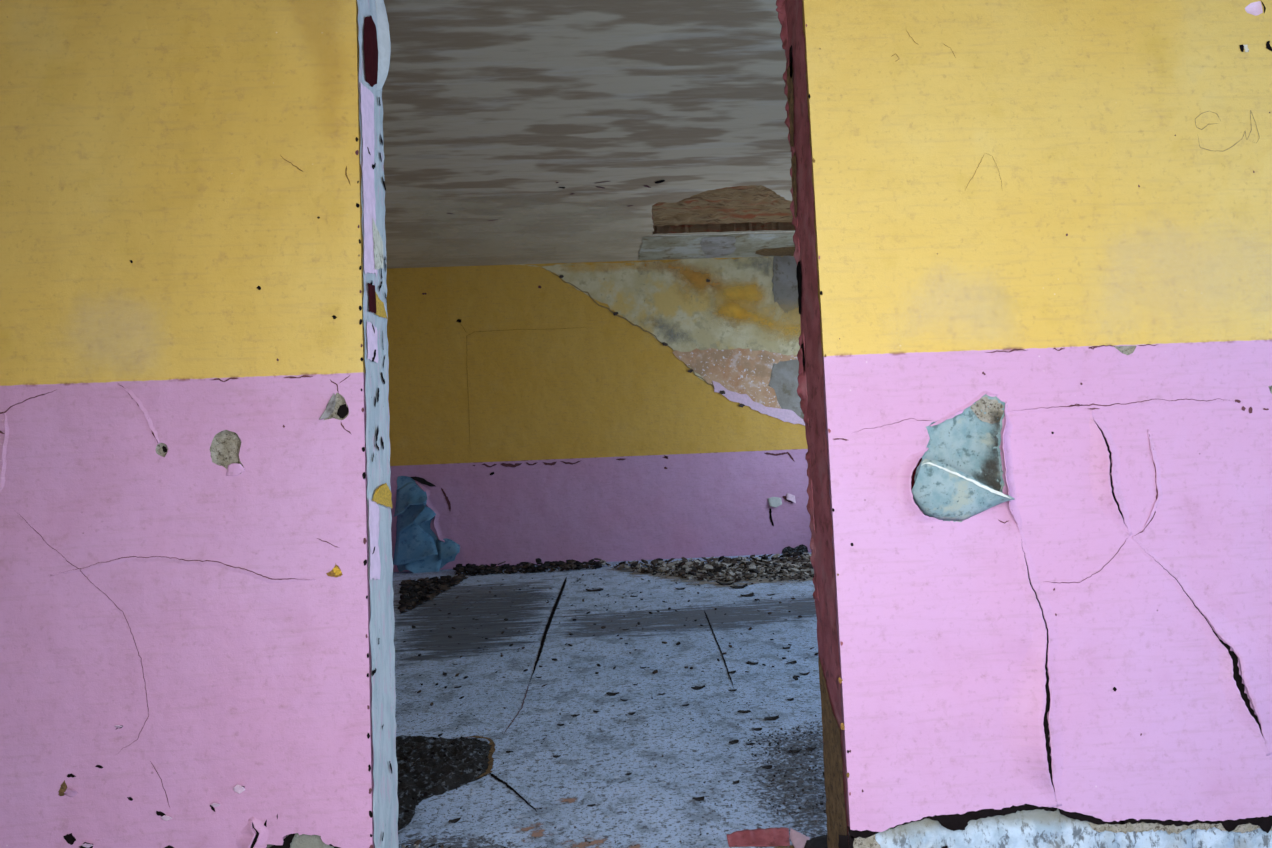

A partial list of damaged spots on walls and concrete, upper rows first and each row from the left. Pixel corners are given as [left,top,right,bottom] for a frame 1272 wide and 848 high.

crack [345,97,386,190]
peeling [355,0,391,363]
peeling [514,0,811,426]
crack [0,390,316,807]
spalling [319,376,364,435]
crack [370,257,387,462]
peeling [363,476,460,580]
crack [503,577,567,735]
crack [704,611,734,688]
peeling [896,391,1022,537]
crack [999,398,1272,807]
peeling [726,657,1272,848]